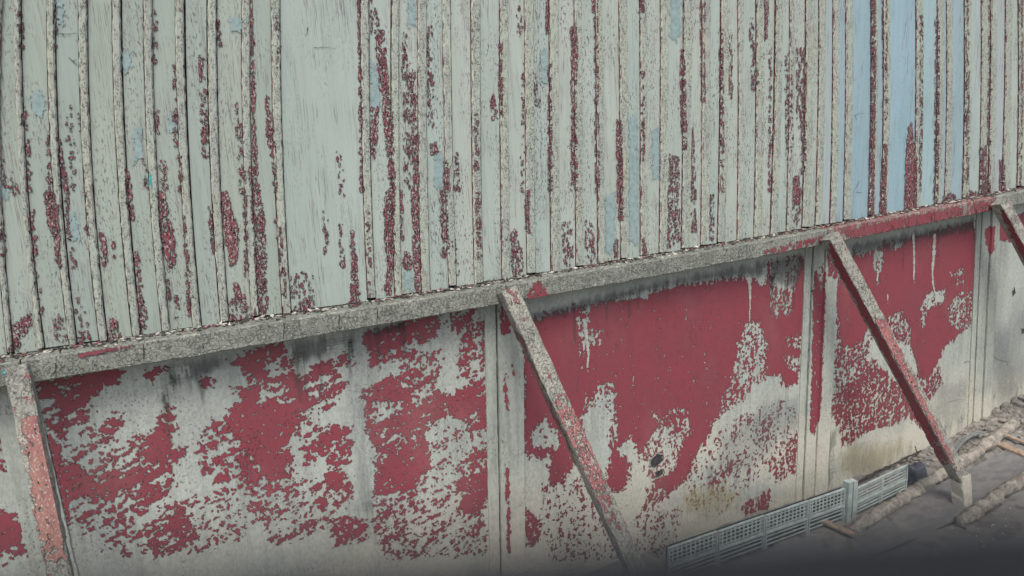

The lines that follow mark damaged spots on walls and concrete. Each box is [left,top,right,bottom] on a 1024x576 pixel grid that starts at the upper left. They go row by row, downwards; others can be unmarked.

peeling [16,11,25,50]
peeling [52,0,68,48]
peeling [0,88,148,358]
peeling [124,64,192,319]
peeling [198,55,210,158]
peeling [207,0,315,322]
peeling [322,0,461,304]
peeling [473,42,504,171]
peeling [498,0,1024,525]
peeling [0,509,29,567]
peeling [35,309,488,558]